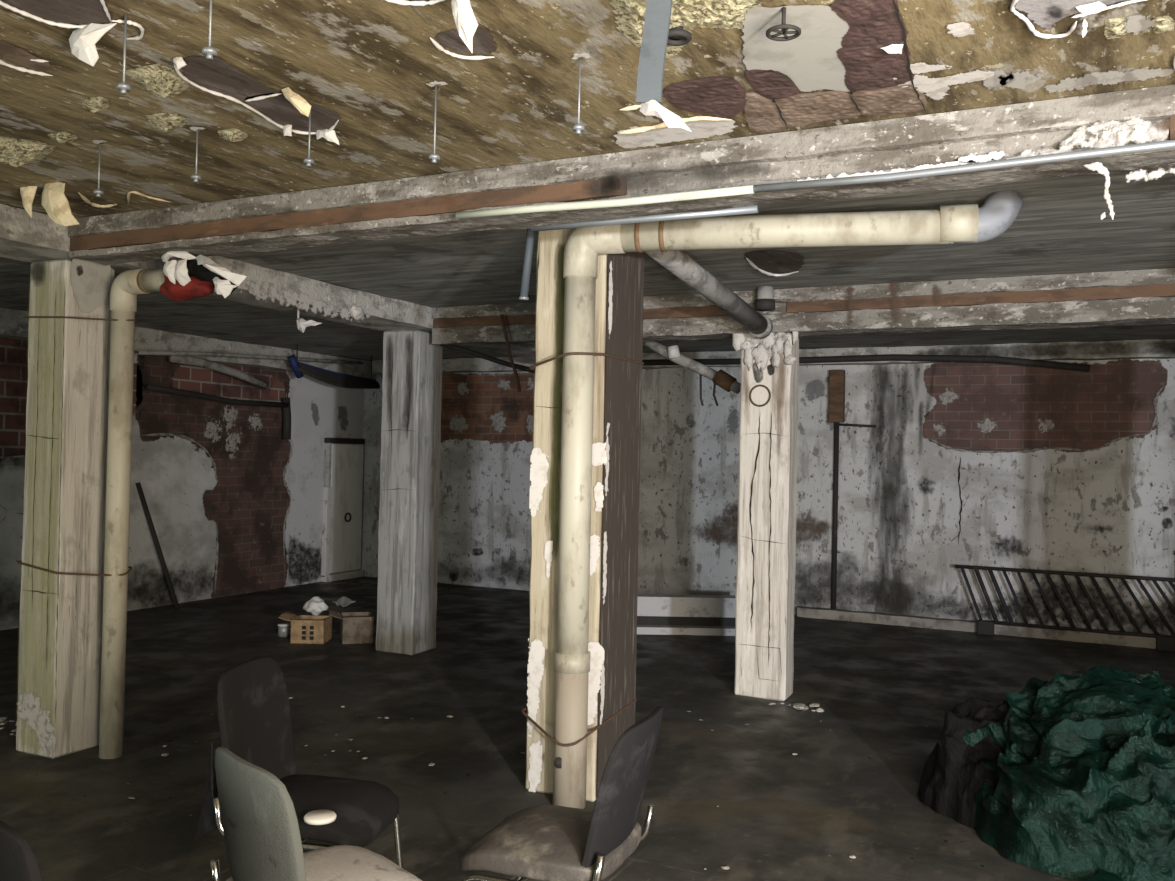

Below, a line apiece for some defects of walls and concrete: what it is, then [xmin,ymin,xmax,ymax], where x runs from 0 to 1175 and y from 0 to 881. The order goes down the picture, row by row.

peeling [0,0,144,66]
peeling [741,5,850,92]
peeling [880,44,1175,100]
peeling [1010,0,1155,39]
leakage [1083,162,1115,220]
flaking render [132,355,364,598]
flaking render [441,372,549,517]
leakage [795,365,961,615]
flaking render [923,359,1168,453]
leakage [128,572,210,605]
leakage [996,539,1021,555]
peeling [527,638,545,792]